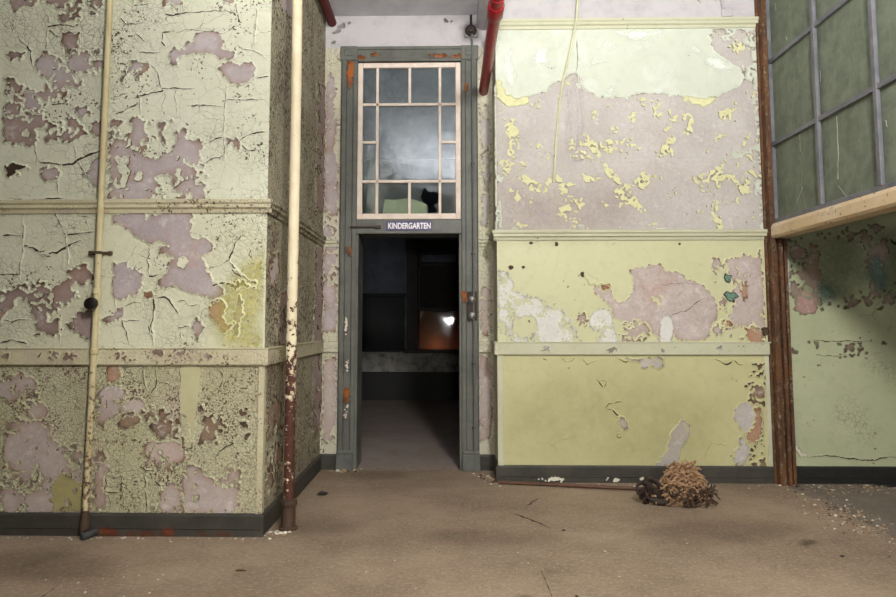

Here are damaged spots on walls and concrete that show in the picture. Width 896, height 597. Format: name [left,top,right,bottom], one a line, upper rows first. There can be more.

crack [16,14,77,69]
peeling [0,0,210,199]
crack [97,0,269,164]
peeling [167,29,258,87]
peeling [313,52,382,341]
peeling [478,28,763,230]
peeling [0,213,287,364]
peeling [592,248,768,371]
peeling [0,398,111,513]
peeling [94,349,253,514]
peeling [311,353,351,445]
crack [807,453,896,463]